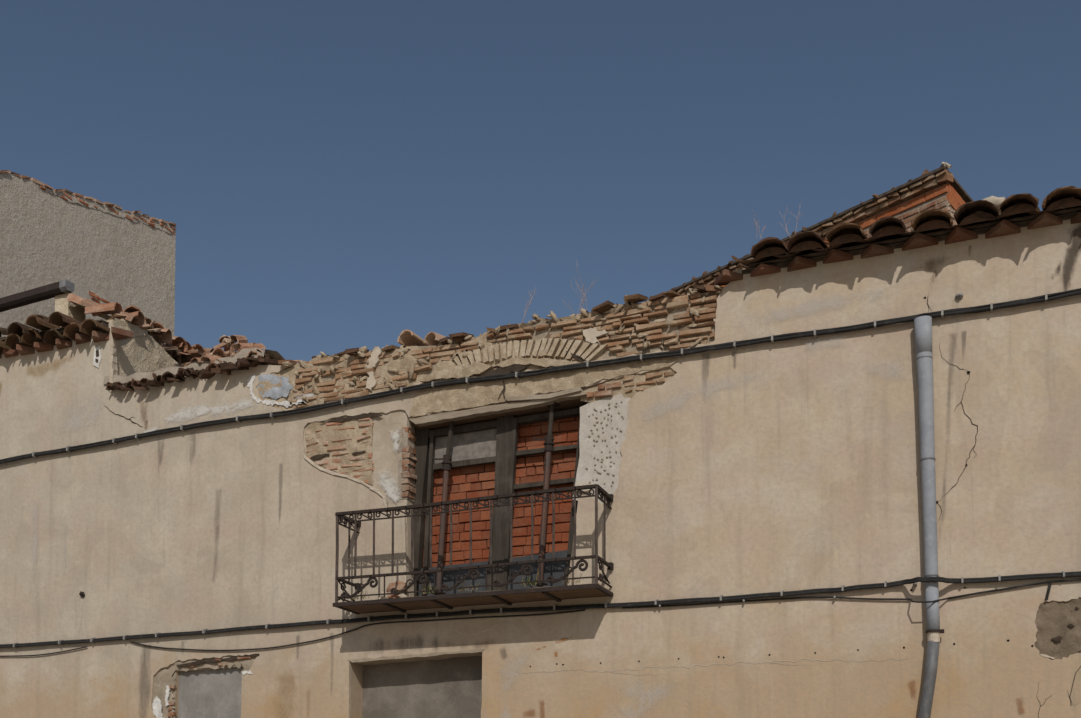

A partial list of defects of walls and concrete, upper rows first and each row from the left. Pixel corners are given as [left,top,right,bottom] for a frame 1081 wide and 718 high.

spalling [39,185,176,235]
damp [1057,226,1081,289]
spalling [89,291,113,304]
spalling [302,356,677,523]
crack [936,343,978,521]
spalling [1034,597,1081,660]
spalling [152,654,259,718]